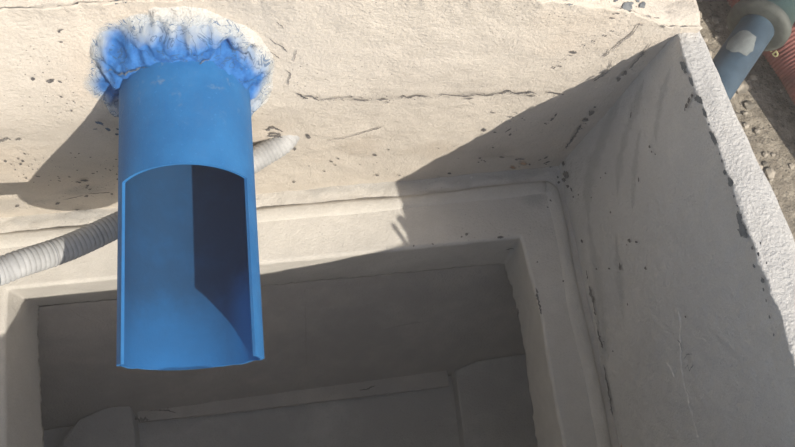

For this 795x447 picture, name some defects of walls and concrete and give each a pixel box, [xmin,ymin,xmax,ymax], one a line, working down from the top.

crack [108,67,148,76]
crack [270,22,564,103]